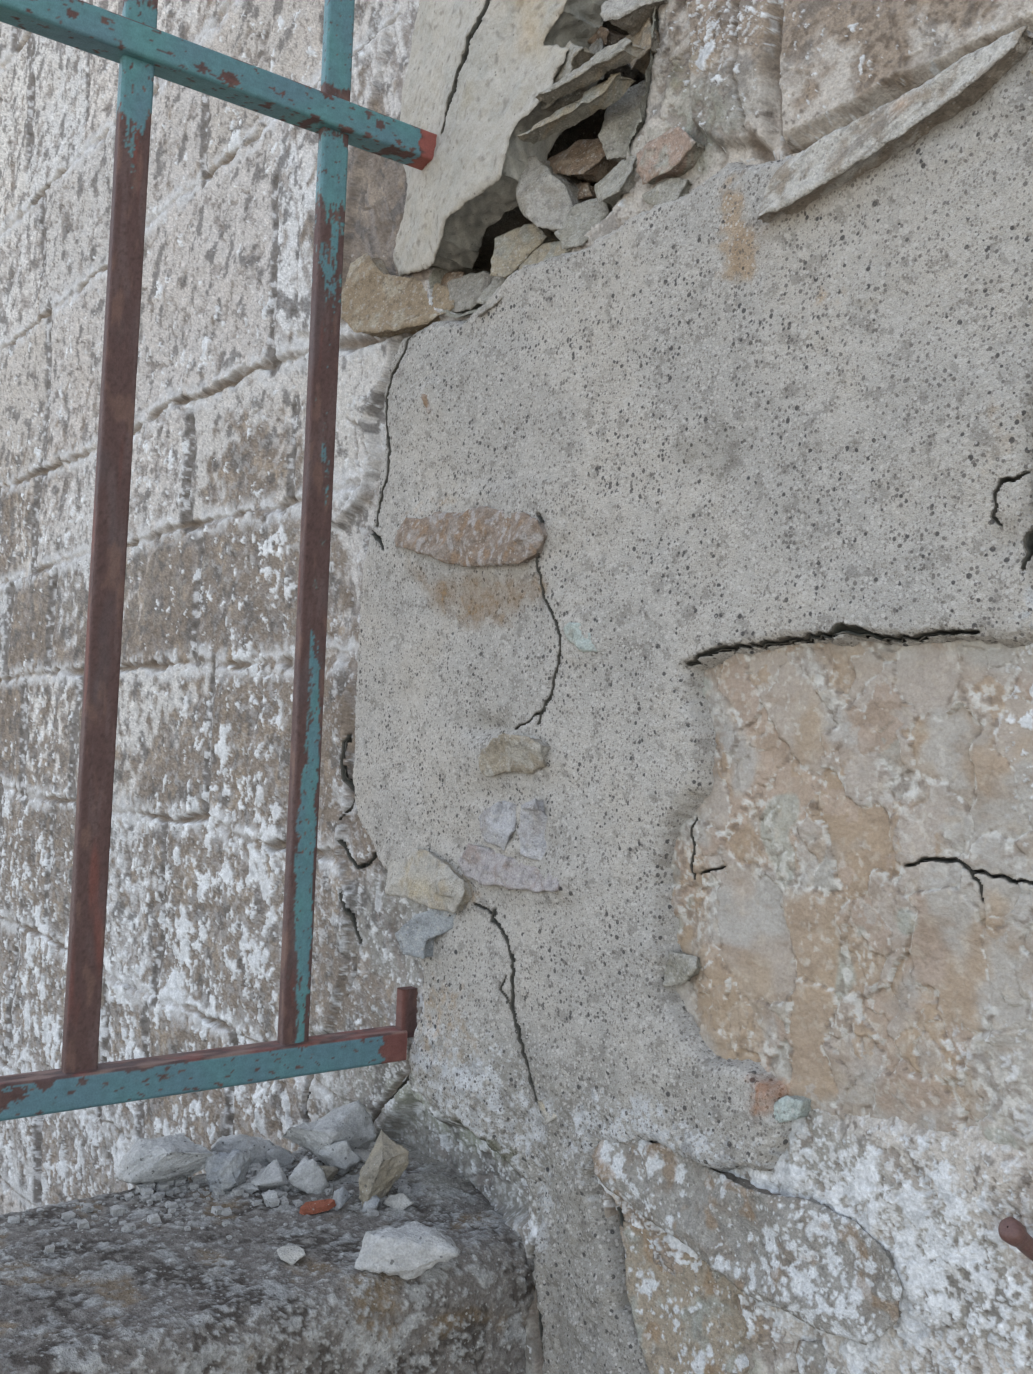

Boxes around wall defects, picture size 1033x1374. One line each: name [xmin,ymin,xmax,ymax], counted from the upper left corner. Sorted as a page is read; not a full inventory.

crack [441,0,490,134]
spalling [547,109,606,159]
spalling [602,21,630,35]
spalling [626,6,659,156]
spalling [469,206,533,273]
crack [371,336,412,549]
crack [515,513,562,730]
crack [686,622,980,666]
spalling [670,635,1033,1159]
crack [904,858,1033,901]
crack [474,903,538,1103]